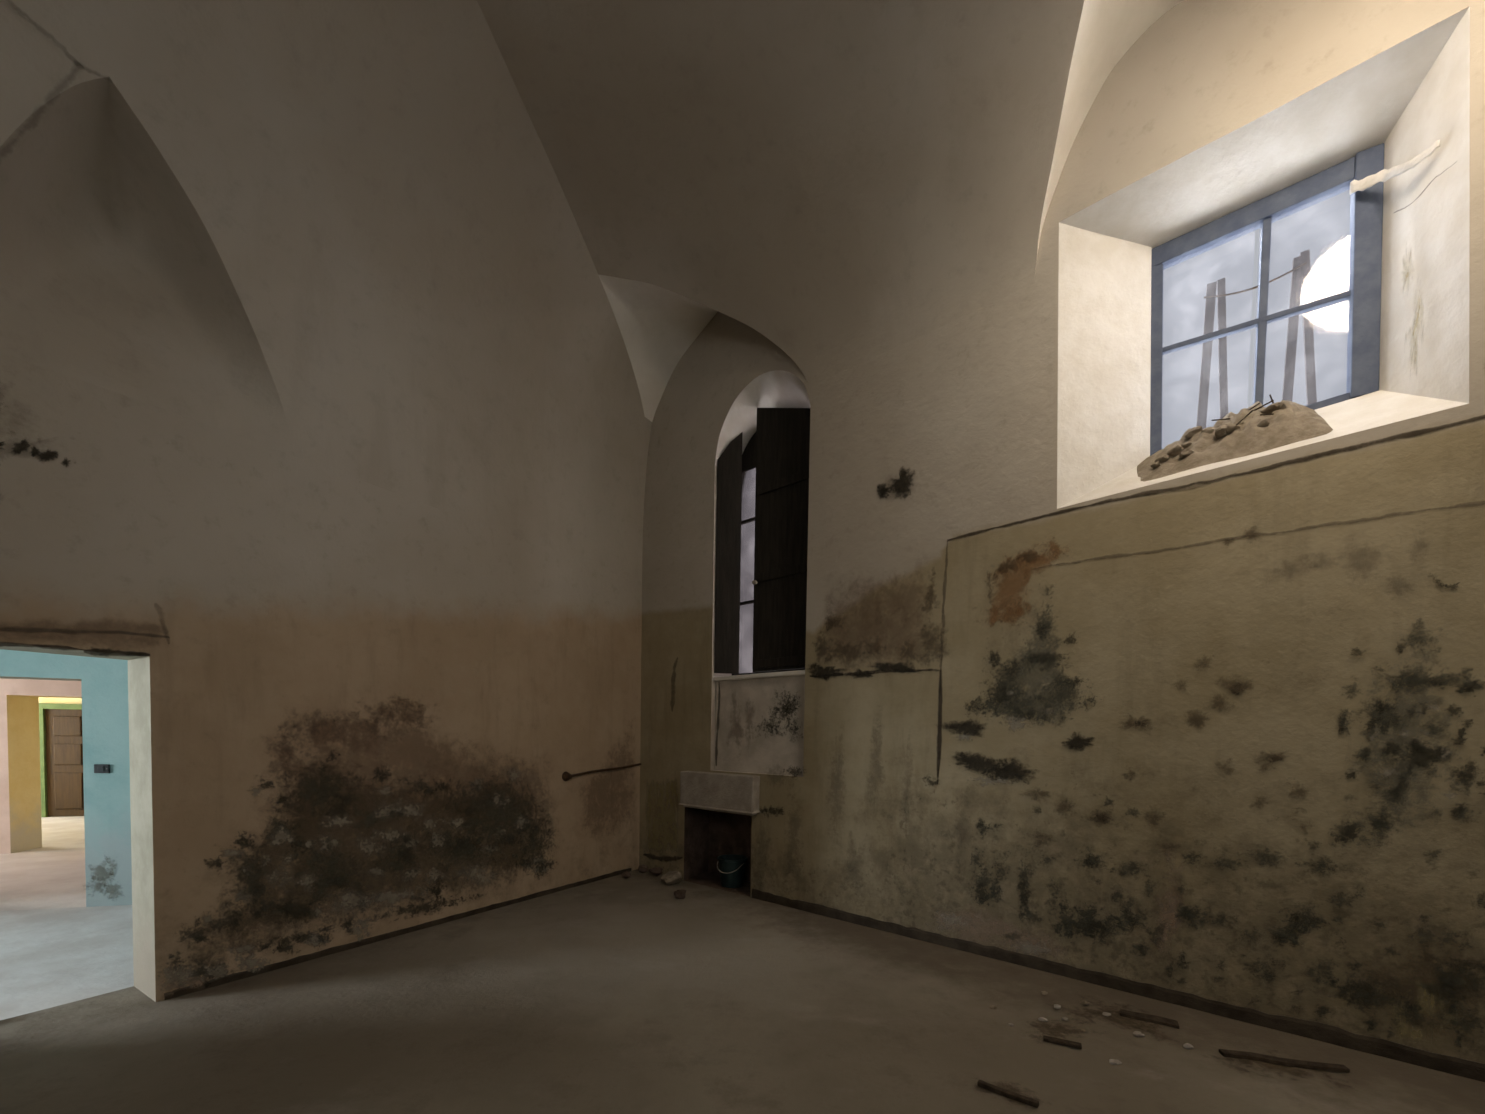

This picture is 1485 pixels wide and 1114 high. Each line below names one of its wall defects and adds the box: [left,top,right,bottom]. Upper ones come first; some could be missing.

leakage [757,693,799,736]
leakage [965,586,1093,732]
crack [808,415,1485,786]
leakage [163,752,553,988]
leakage [971,818,1363,981]